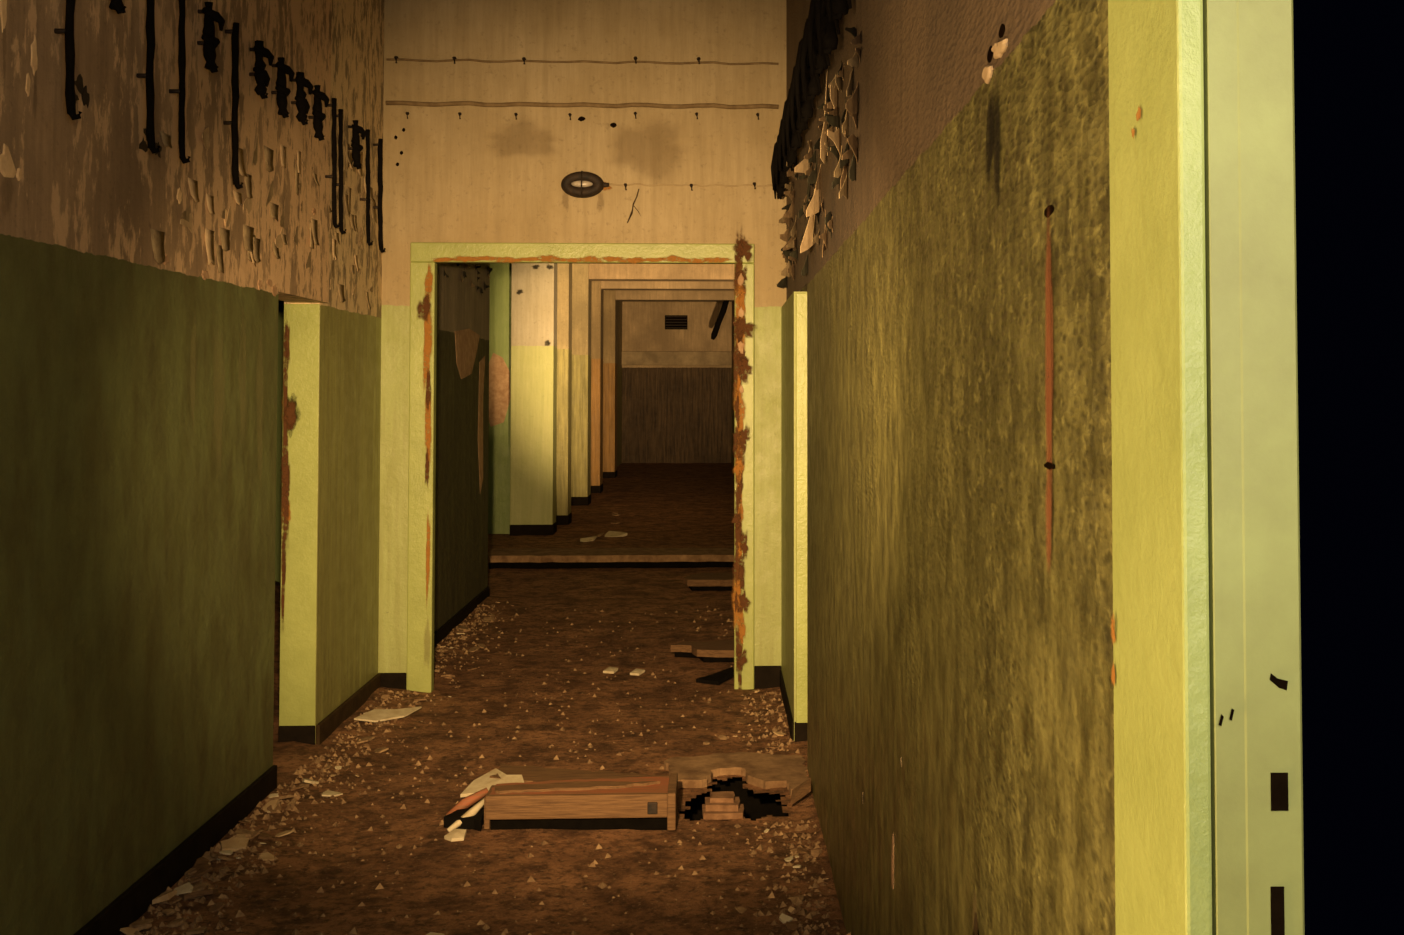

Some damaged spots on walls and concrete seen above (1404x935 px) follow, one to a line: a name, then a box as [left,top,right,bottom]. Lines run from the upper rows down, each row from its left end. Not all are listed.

spalling [0,144,22,181]
spalling [25,36,38,96]
spalling [75,74,90,108]
peeling [150,228,170,265]
peeling [177,134,378,310]
flaking render [777,27,861,288]
corrosion [281,325,297,619]
corrosion [417,234,755,690]
corrosion [1044,245,1055,560]